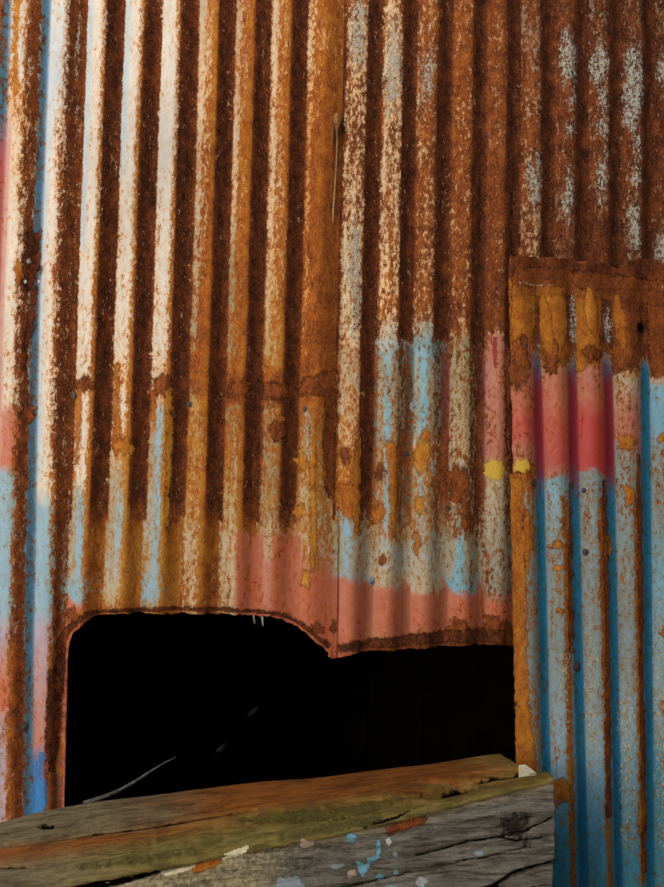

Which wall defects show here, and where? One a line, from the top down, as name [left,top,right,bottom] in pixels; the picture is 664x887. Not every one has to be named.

rust [13,226,43,372]
peeling [568,292,578,345]
rust [492,266,664,390]
rust [17,402,38,425]
rust [73,374,96,464]
rust [110,362,135,456]
rust [149,373,174,532]
rust [261,369,398,589]
rust [44,463,537,773]
rust [552,490,575,653]
rust [601,479,613,818]
rust [618,434,647,874]